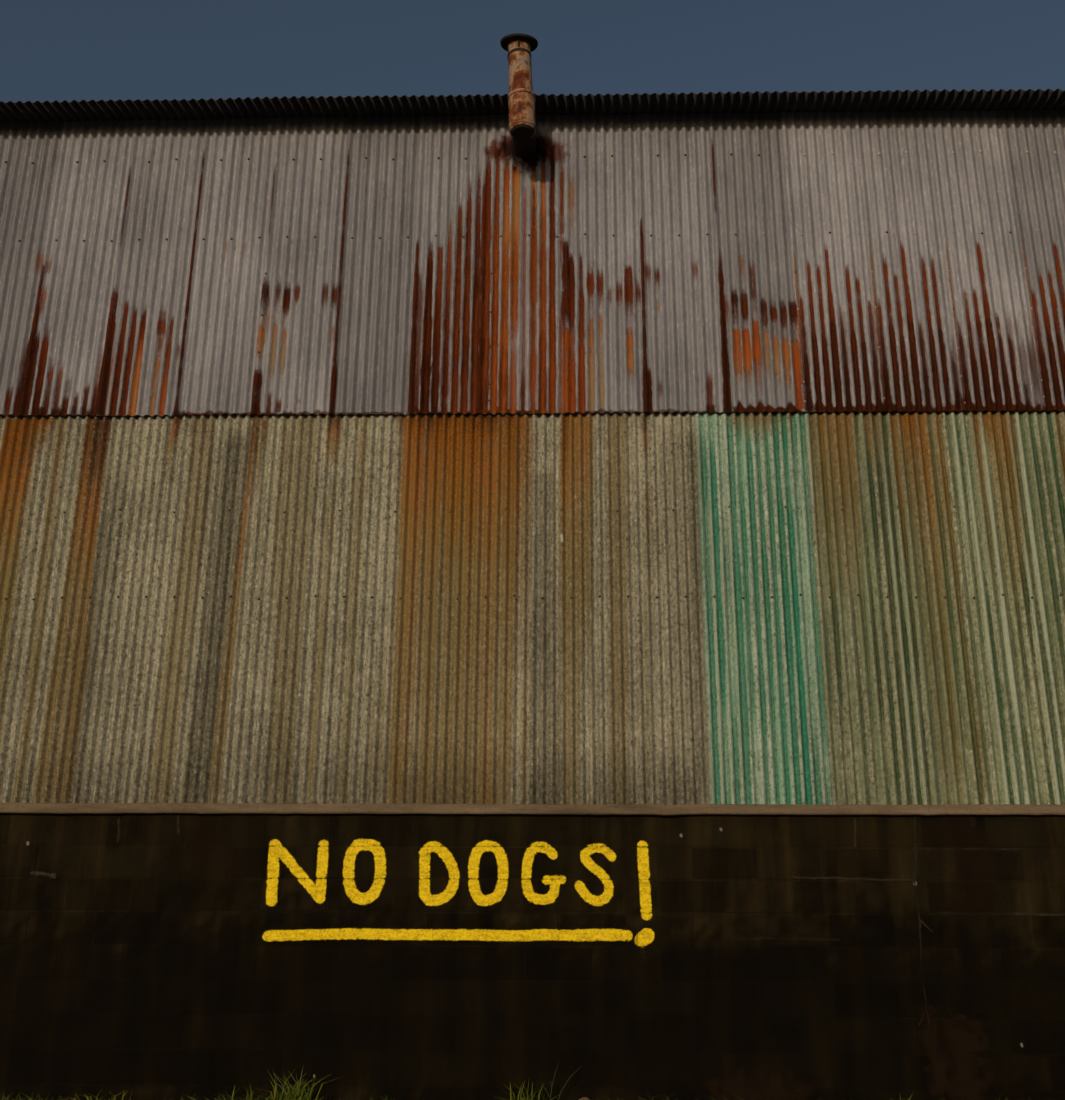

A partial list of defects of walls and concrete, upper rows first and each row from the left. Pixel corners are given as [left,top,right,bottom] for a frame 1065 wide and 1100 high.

rust [0,135,662,803]